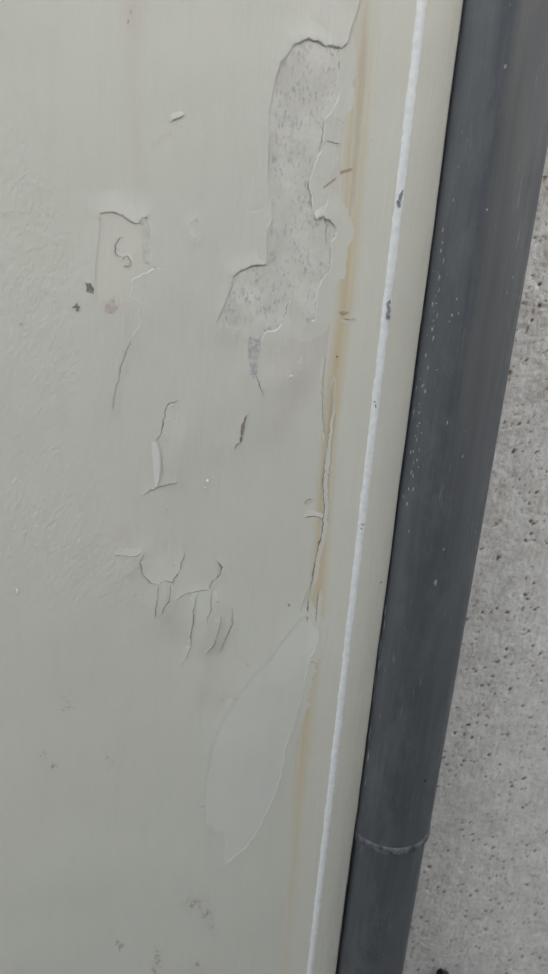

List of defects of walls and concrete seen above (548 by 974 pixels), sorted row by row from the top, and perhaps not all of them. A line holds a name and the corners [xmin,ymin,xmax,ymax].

peeling [193,0,360,402]
peeling [139,400,181,496]